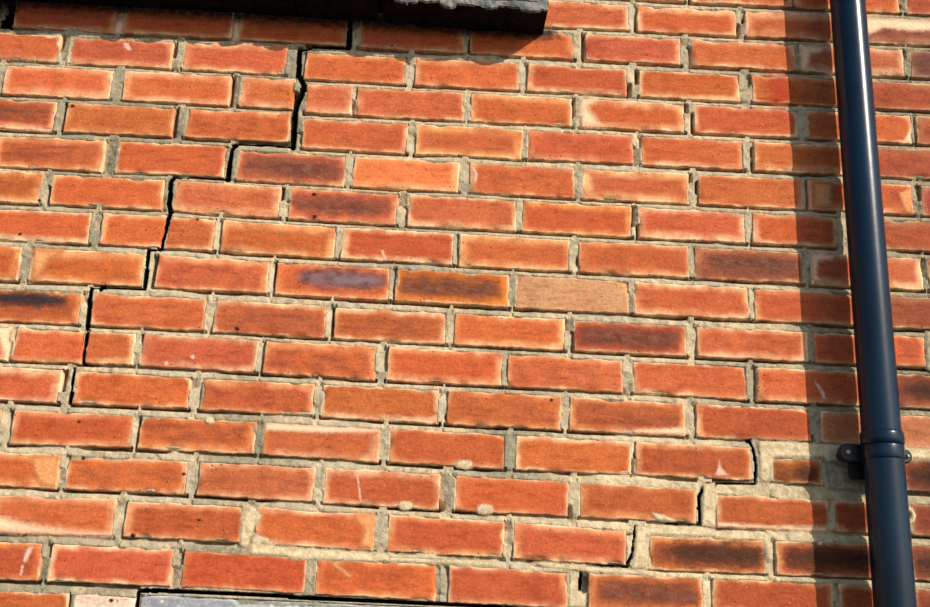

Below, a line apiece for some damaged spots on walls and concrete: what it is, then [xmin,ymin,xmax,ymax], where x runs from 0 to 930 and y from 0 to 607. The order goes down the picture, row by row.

crack [69,23,353,406]
crack [665,440,757,526]
crack [568,527,636,605]